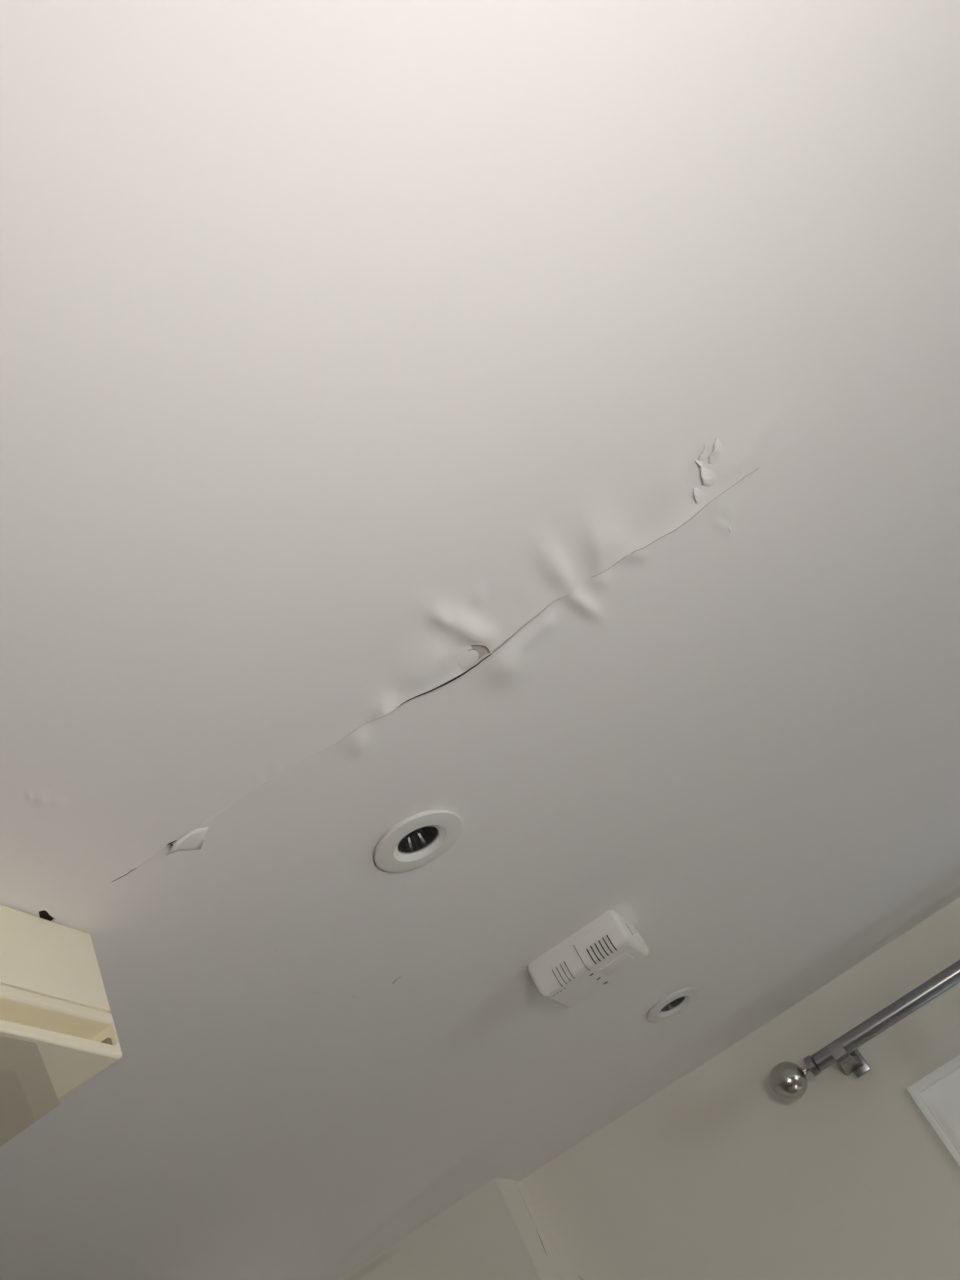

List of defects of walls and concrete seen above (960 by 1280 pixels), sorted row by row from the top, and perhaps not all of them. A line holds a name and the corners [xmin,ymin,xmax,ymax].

crack [591,469,757,578]
crack [112,598,560,882]